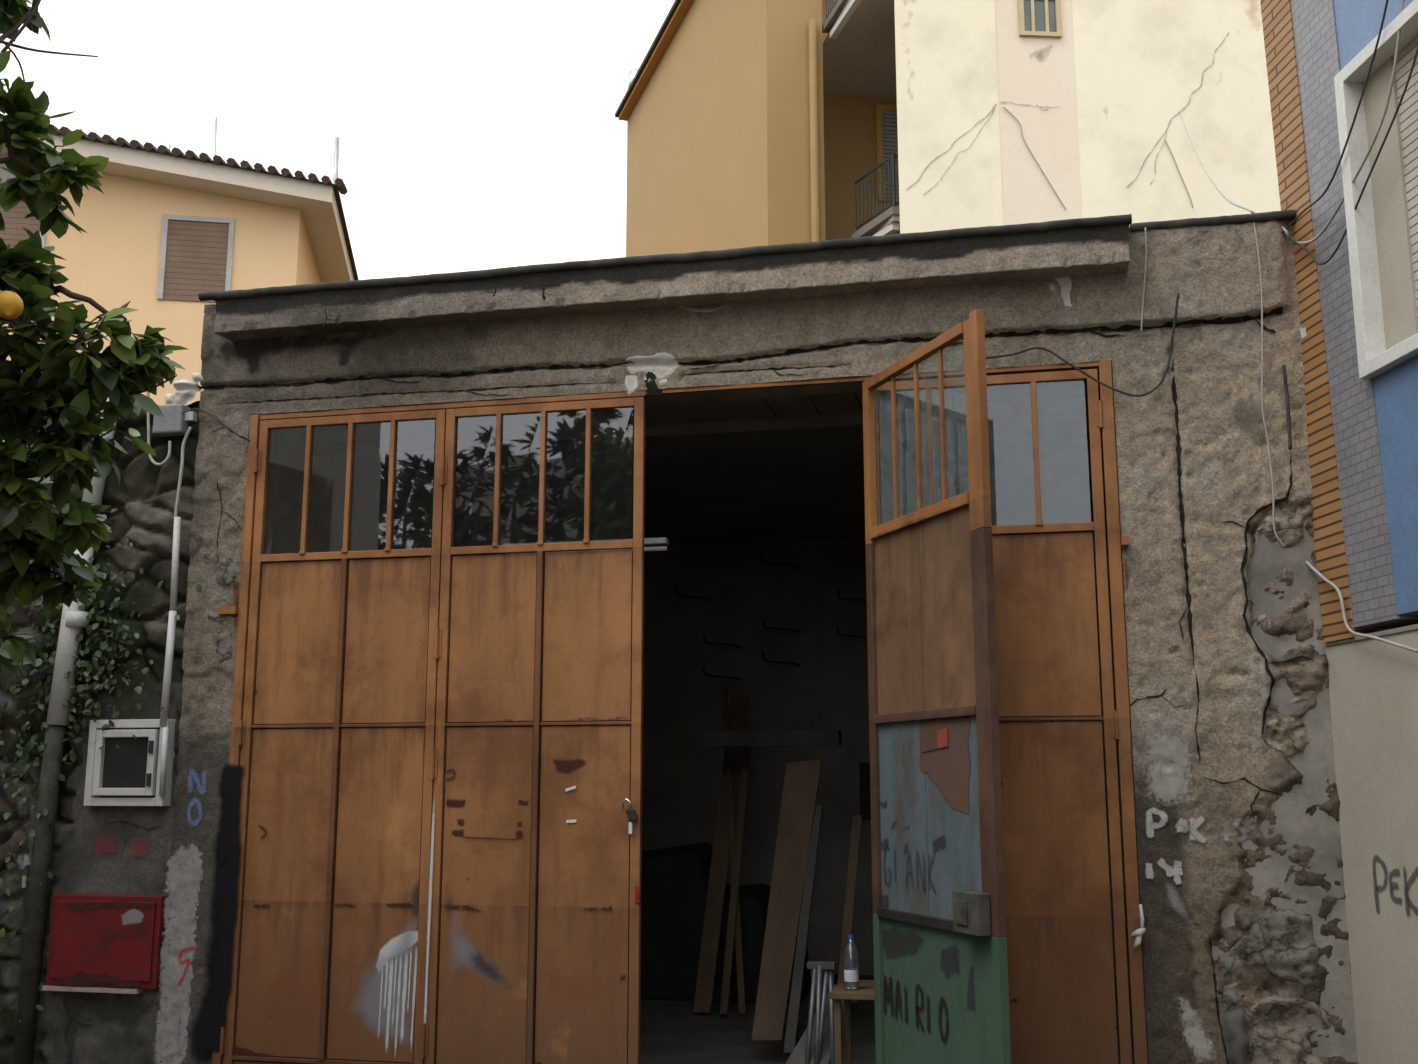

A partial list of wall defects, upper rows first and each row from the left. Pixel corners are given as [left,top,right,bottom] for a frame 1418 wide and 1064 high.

crack [907,102,1055,195]
crack [1127,34,1229,188]
peeling [1254,508,1305,548]
spalling [1266,689,1315,760]
crack [1208,928,1245,1064]